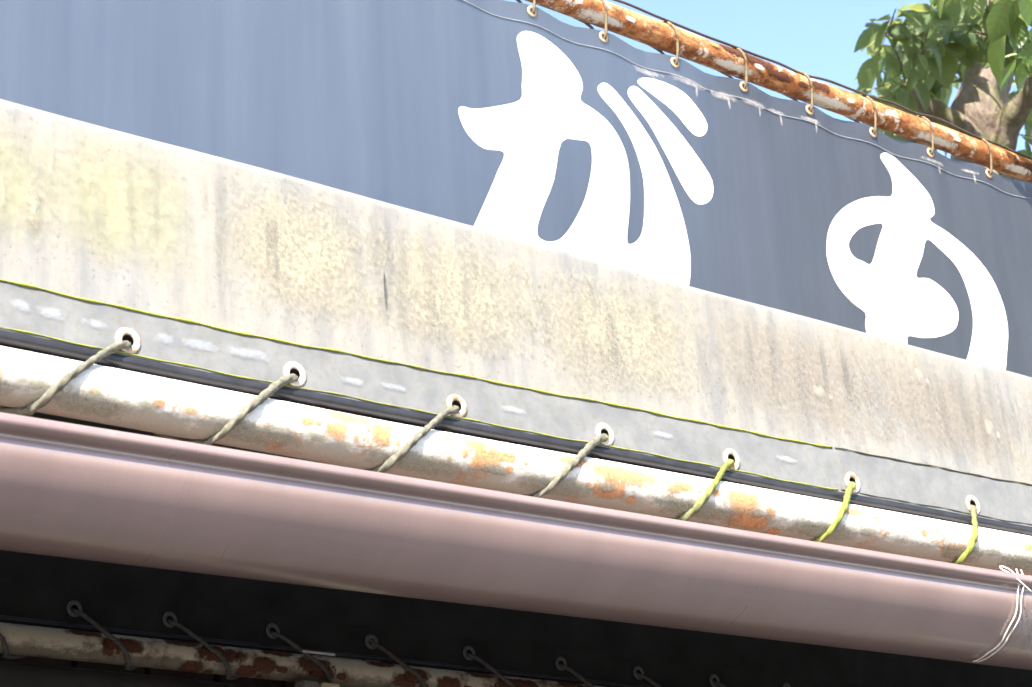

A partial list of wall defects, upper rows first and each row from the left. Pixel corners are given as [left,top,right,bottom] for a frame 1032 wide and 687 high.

corrosion [113,371,152,384]
corrosion [301,406,401,445]
corrosion [444,436,528,474]
corrosion [546,453,780,535]
corrosion [65,629,144,656]
corrosion [163,639,346,680]